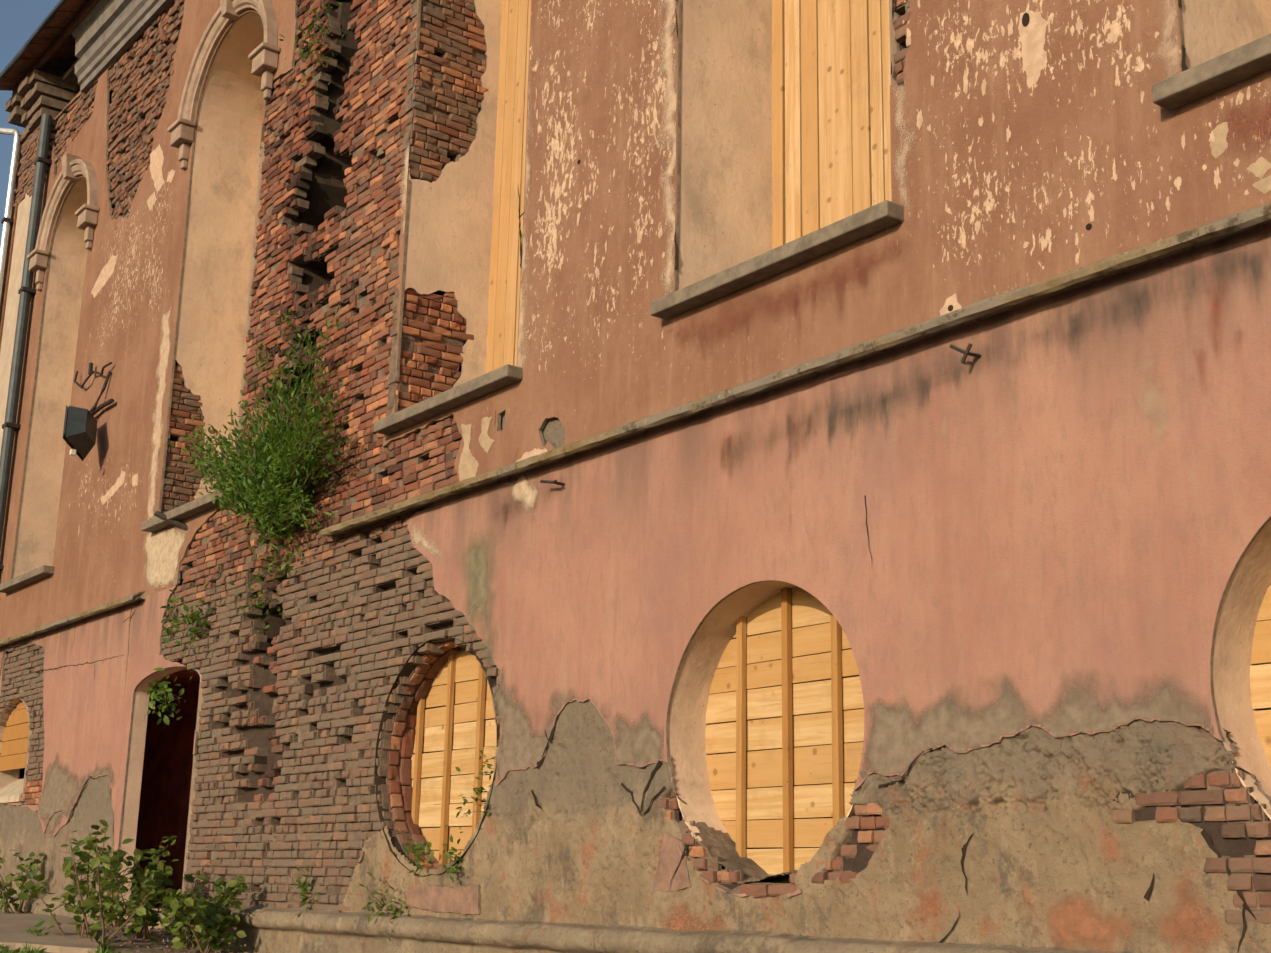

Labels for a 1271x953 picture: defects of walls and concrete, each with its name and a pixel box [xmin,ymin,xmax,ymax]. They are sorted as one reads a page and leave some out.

flaking render [12,0,215,547]
peeling [517,0,677,380]
peeling [893,0,1182,316]
peeling [1181,83,1271,204]
flaking render [512,418,565,508]
flaking render [0,642,115,896]
crack [44,776,114,855]